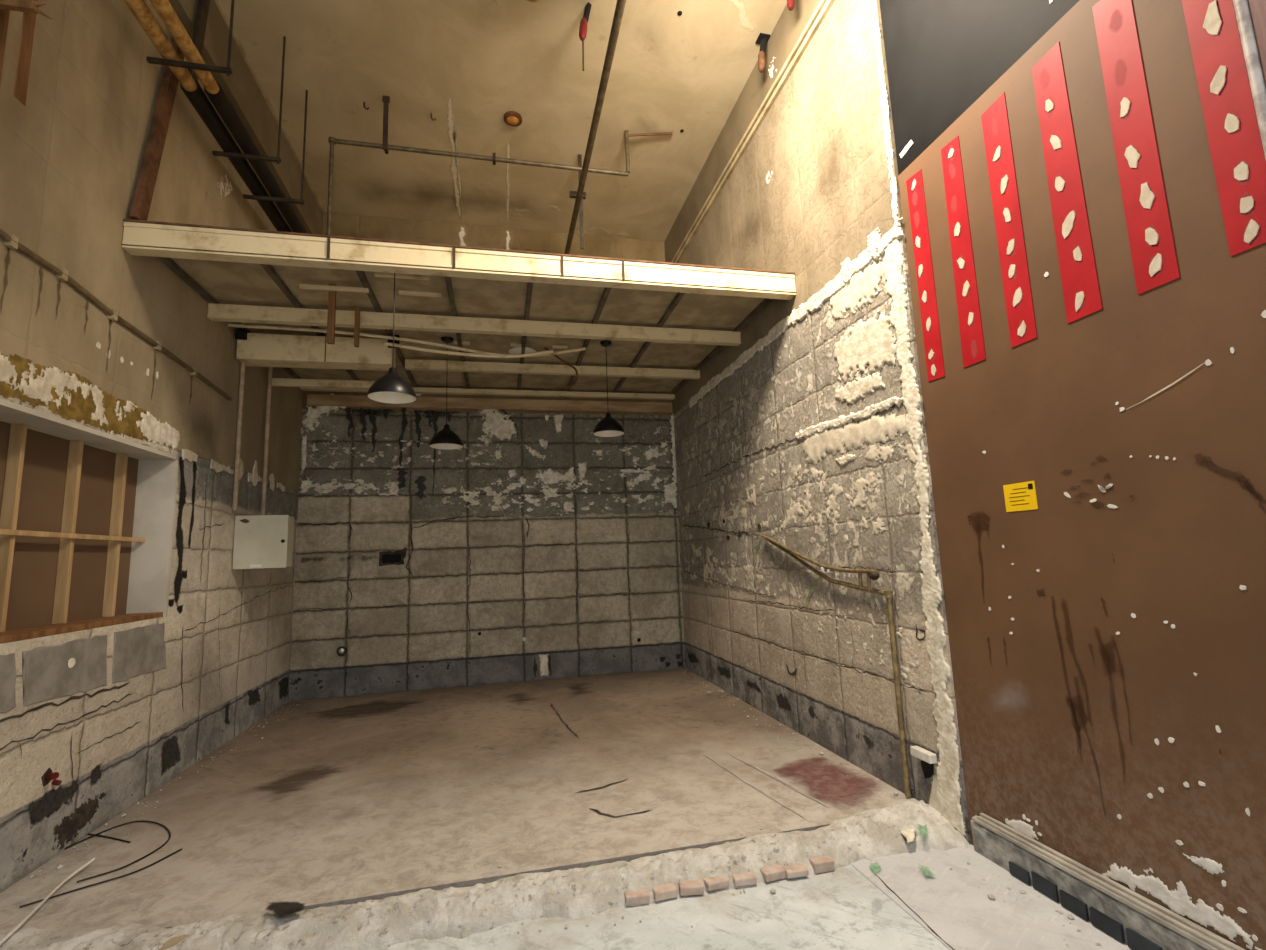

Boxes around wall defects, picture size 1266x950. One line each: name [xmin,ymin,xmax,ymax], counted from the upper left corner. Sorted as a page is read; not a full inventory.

spalling [182,449,285,491]
peeling [300,393,442,496]
water stain [345,408,461,492]
peeling [441,409,677,516]
peeling [688,0,966,835]
peeling [0,623,166,722]
peeling [539,654,549,677]
spalling [53,792,106,850]
peeling [1102,863,1262,950]
peeling [1175,840,1226,887]